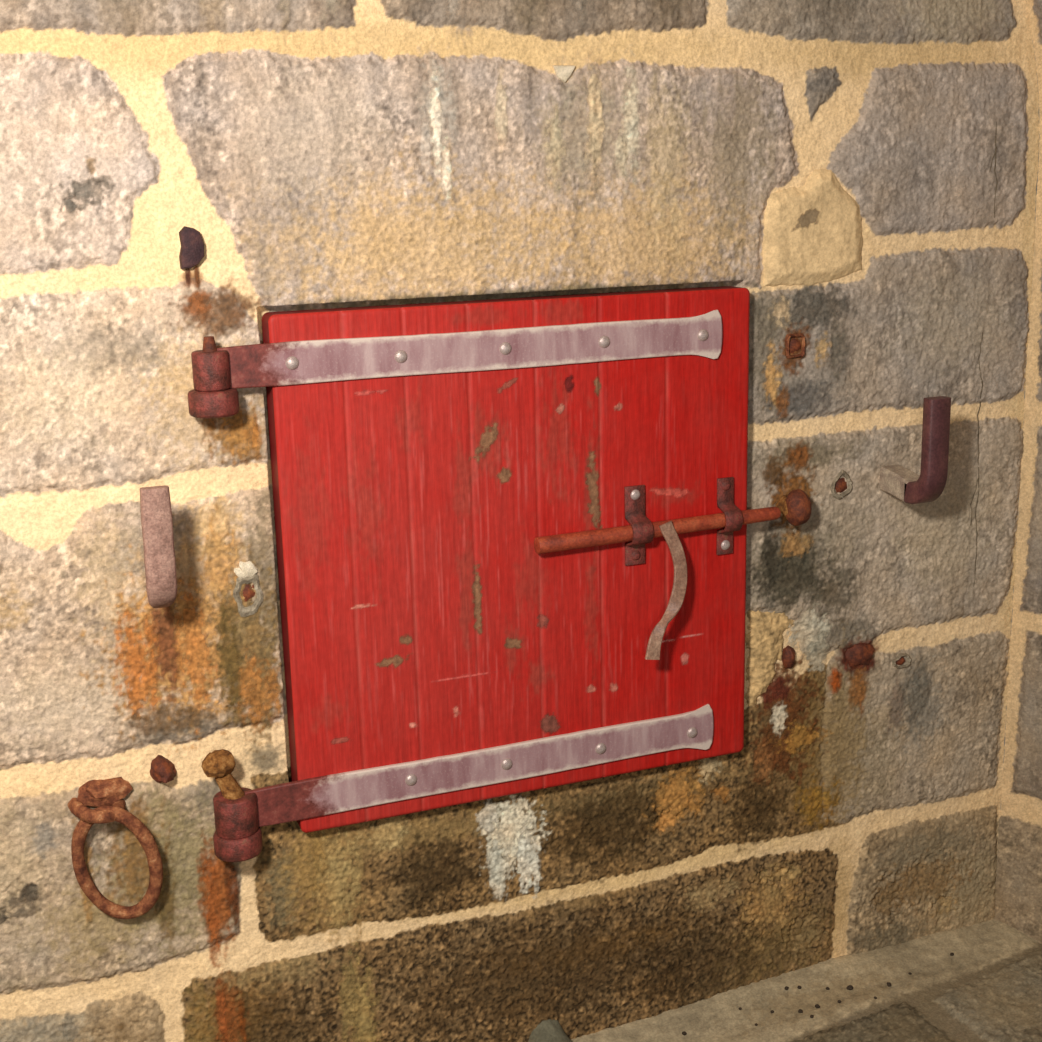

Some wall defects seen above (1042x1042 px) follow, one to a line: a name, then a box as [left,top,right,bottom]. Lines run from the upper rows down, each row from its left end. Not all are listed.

rust [183,265,260,336]
rust [764,296,829,417]
rust [203,410,262,464]
rust [763,445,813,557]
rust [98,507,282,739]
rust [831,638,876,709]
rust [744,660,838,828]
rust [198,849,240,964]
water stain [310,787,662,1042]